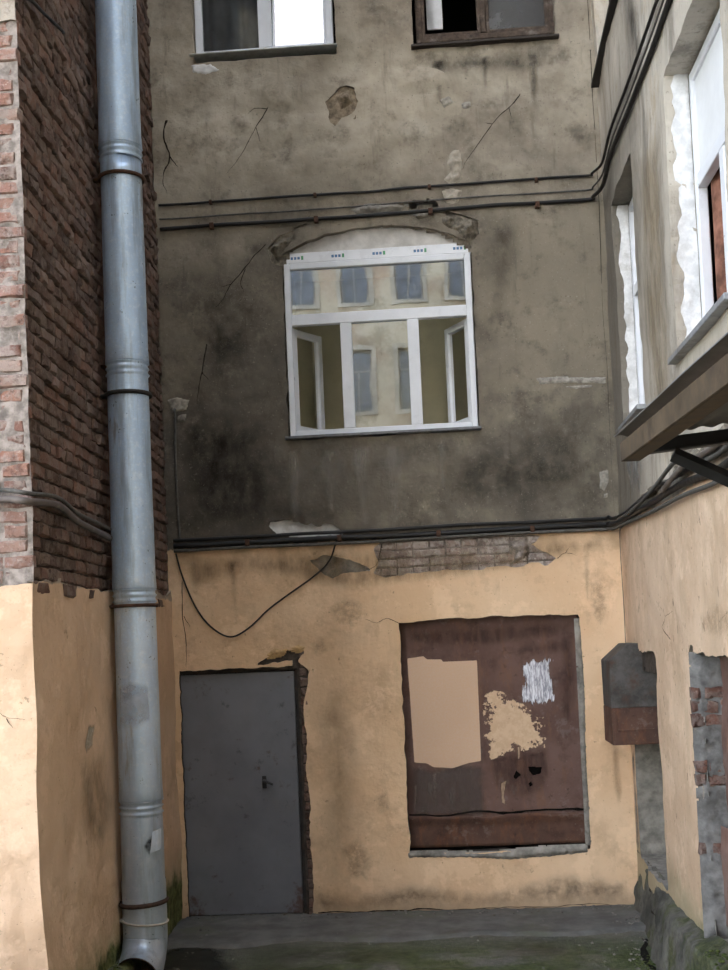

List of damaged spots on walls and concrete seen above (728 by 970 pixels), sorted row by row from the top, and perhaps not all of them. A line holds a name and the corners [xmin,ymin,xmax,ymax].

crack [163,120,178,191]
crack [226,107,268,174]
spalling [325,87,358,126]
crack [463,94,520,168]
spalling [0,8,36,590]
spalling [310,534,556,578]
spalling [246,650,314,914]
spalling [688,652,728,938]